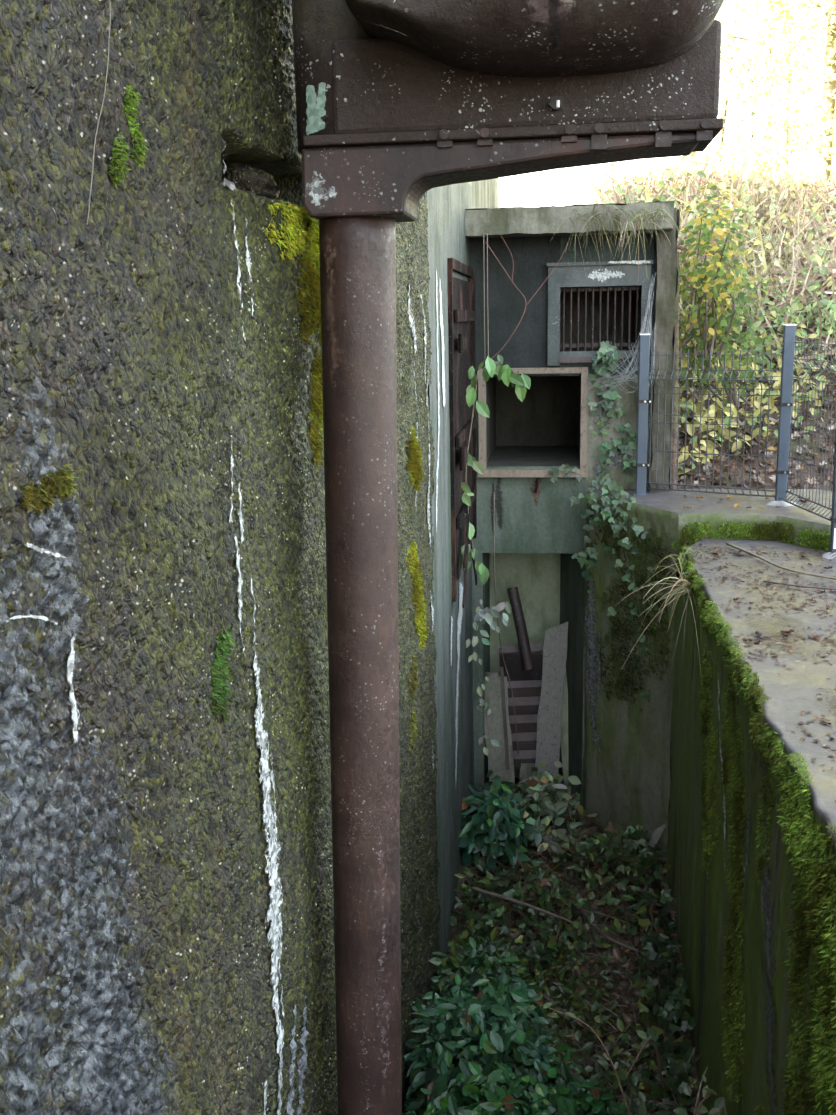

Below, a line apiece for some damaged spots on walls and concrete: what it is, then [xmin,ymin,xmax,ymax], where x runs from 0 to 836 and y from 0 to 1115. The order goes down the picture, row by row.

corrosion [526,0,574,49]
corrosion [322,236,344,387]
damp [407,271,446,549]
damp [229,435,285,1115]
damp [451,582,463,787]